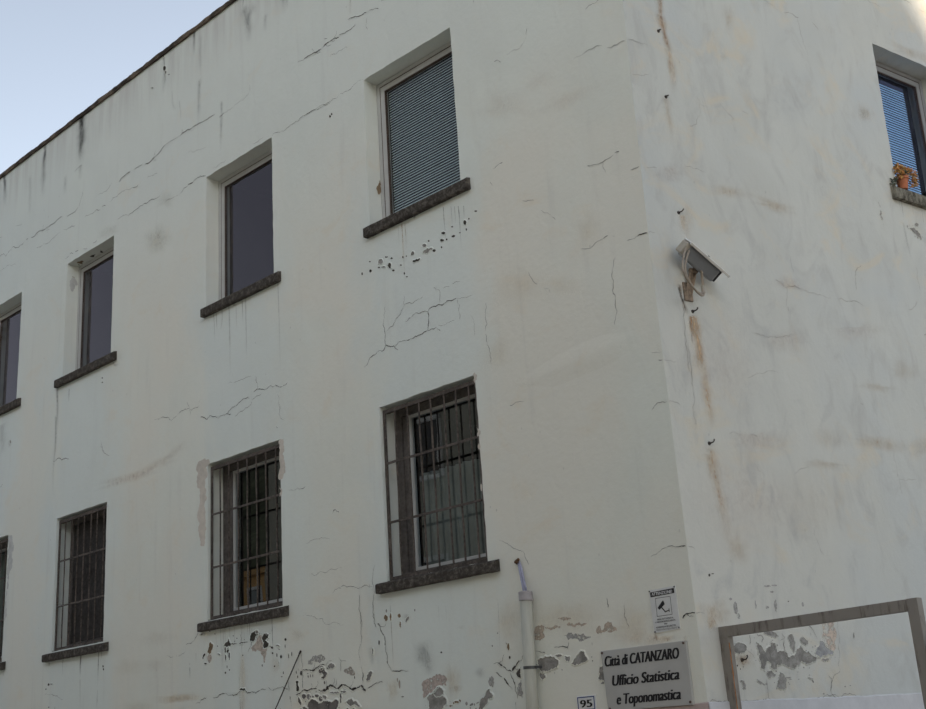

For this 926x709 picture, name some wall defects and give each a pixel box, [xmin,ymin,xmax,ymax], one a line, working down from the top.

spalling [199,622,292,677]
peeling [295,654,362,709]